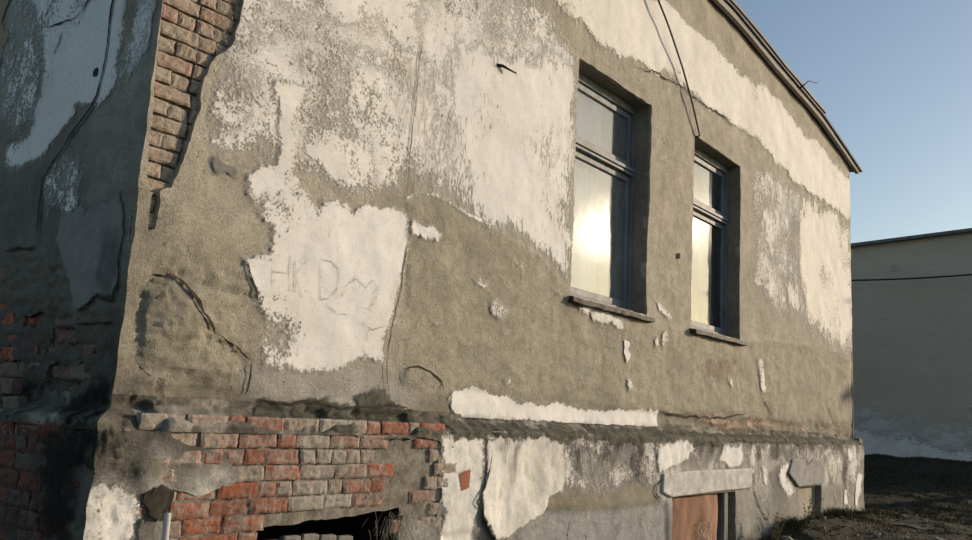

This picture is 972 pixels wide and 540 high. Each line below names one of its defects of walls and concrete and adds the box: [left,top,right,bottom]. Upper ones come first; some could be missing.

crack [4,0,114,252]
crack [407,21,424,189]
peeling [1,0,852,373]
crack [152,237,444,412]
water stain [36,373,126,540]
flaking render [0,302,972,540]
water stain [854,406,972,455]